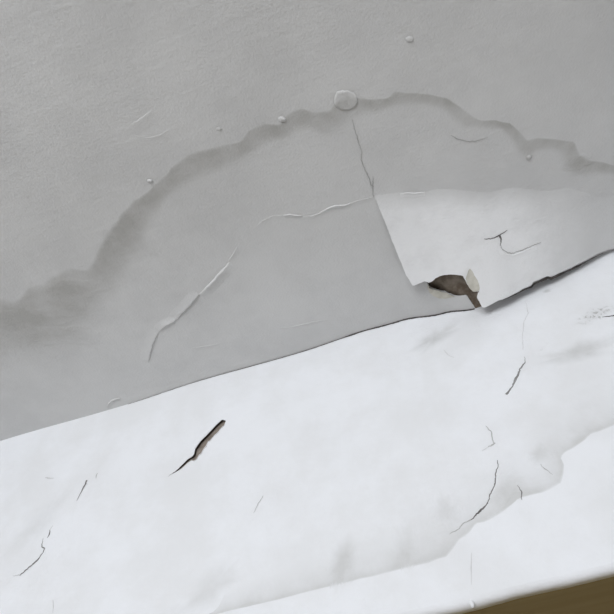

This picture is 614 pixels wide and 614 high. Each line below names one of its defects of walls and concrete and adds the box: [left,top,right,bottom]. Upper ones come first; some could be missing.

water stain [0,91,614,370]
crack [254,120,374,232]
flaking render [374,188,614,308]
crack [488,230,541,260]
crack [139,247,242,363]
crack [505,304,529,397]
crack [450,460,502,534]